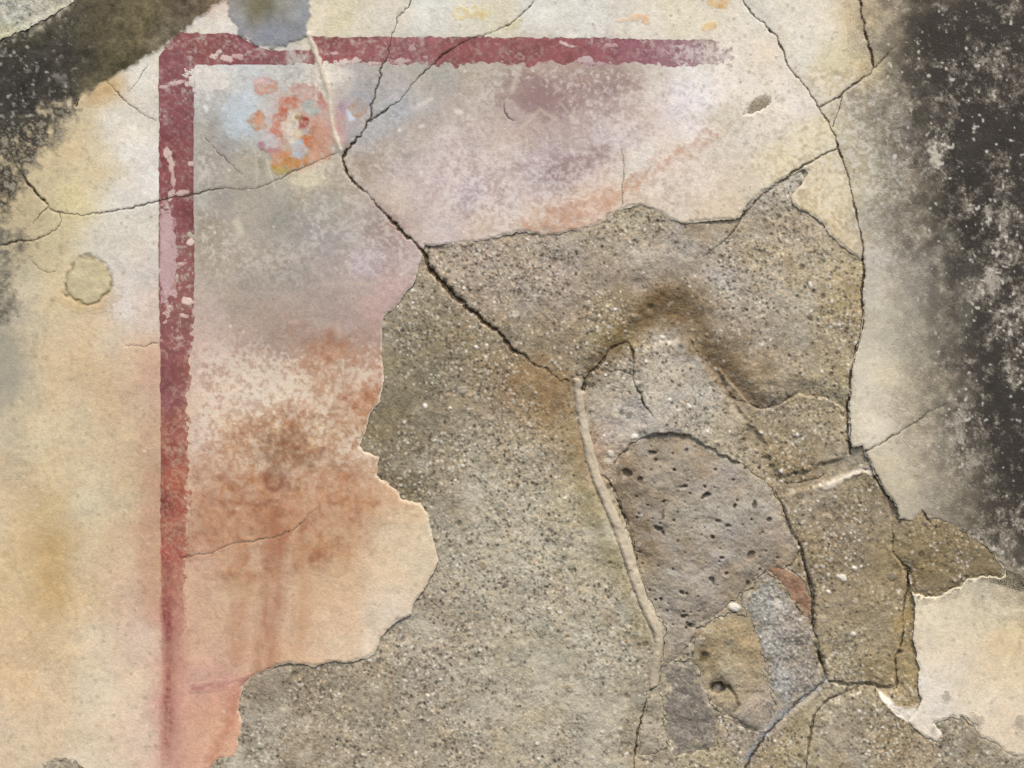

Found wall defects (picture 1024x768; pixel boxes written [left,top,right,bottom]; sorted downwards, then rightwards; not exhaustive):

leakage [74,77,122,109]
crack [0,0,653,416]
leakage [360,274,773,515]
spalling [210,169,1024,768]
crack [600,474,648,589]
crack [702,0,952,768]
crack [633,689,652,768]